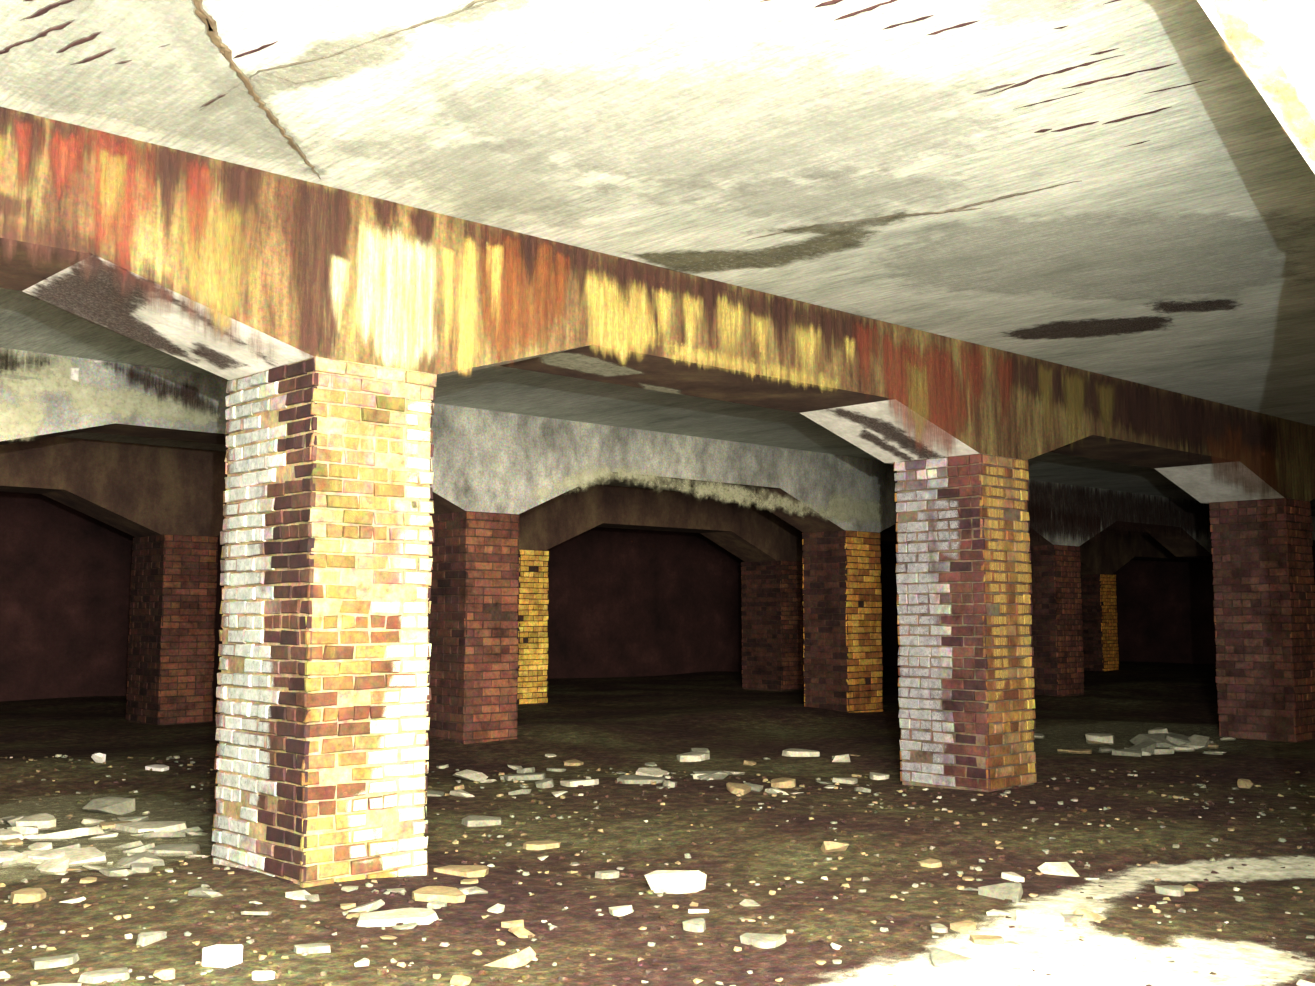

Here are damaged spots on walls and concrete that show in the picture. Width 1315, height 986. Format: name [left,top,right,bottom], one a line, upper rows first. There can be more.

crack [191,0,495,179]
rust [1212,0,1315,163]
rust [18,124,29,171]
rust [95,131,149,267]
rust [484,240,569,351]
water stain [1003,300,1242,340]
water stain [0,348,219,436]